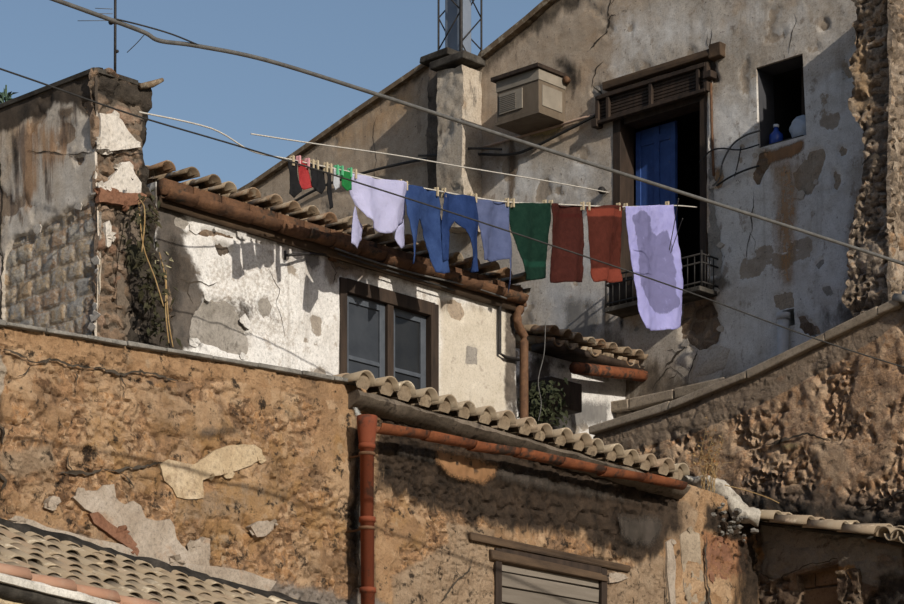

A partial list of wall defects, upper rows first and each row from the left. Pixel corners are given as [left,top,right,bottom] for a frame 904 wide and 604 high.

crack [590,0,616,94]
crack [28,149,141,165]
flaking render [752,147,770,185]
flaking render [785,149,826,199]
rust [765,140,804,282]
crack [0,163,8,320]
flaking render [681,138,725,350]
peeling [88,302,101,331]
crack [4,349,177,398]
water stain [400,442,438,461]
water stain [449,453,607,499]
water stain [618,516,662,546]